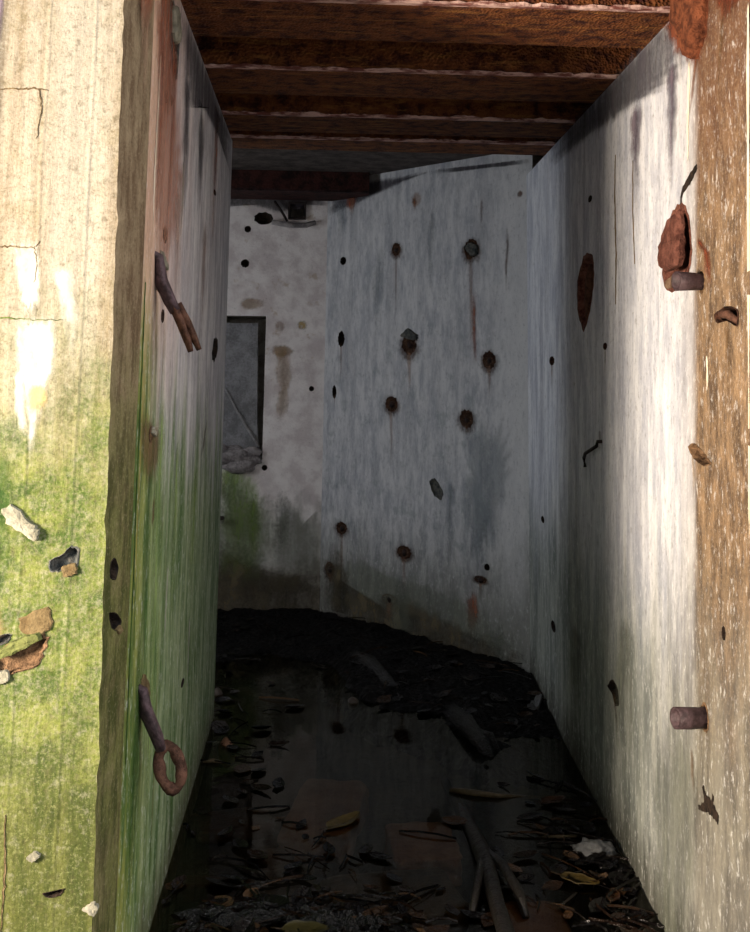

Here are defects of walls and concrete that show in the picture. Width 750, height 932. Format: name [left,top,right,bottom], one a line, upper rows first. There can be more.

corrosion [667,0,738,98]
damp [56,271,77,323]
damp [15,245,54,439]
corrosion [401,338,417,358]
corrosion [473,306,496,372]
corrosion [385,398,398,414]
corrosion [459,412,474,431]
corrosion [396,547,412,562]
damp [217,557,319,611]
damp [332,553,499,658]
spalling [0,607,54,684]